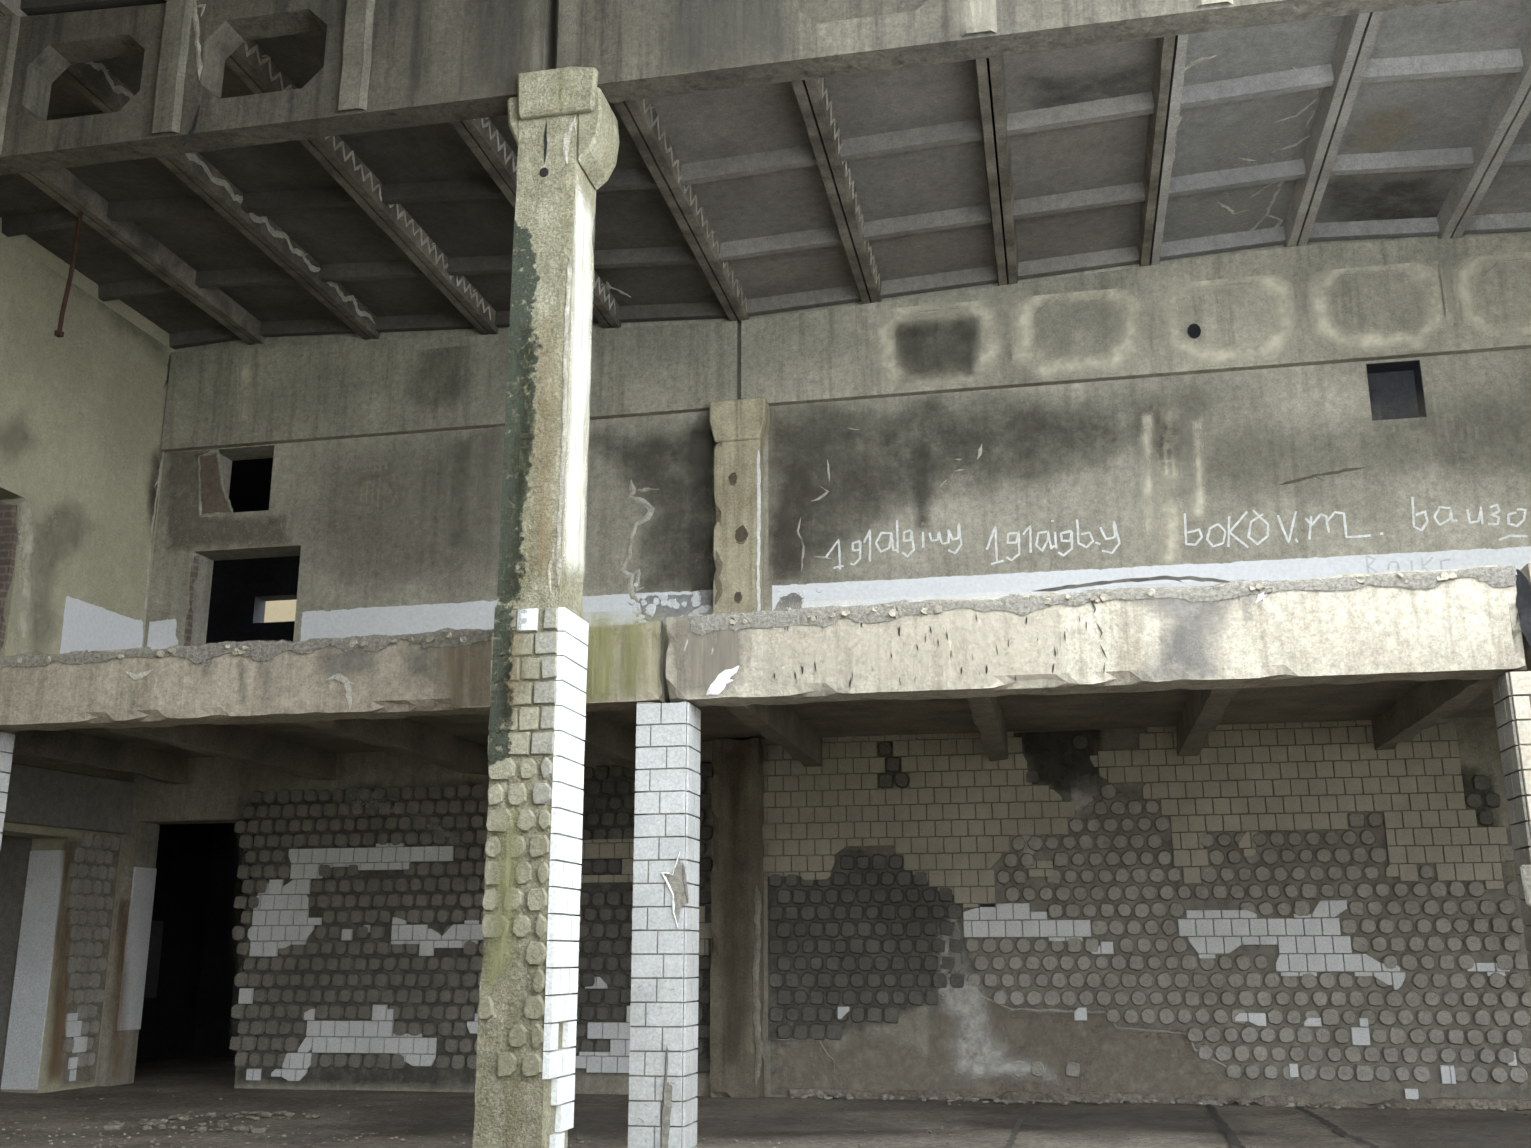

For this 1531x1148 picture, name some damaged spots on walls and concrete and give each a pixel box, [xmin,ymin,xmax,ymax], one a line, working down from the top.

leakage [473,117,517,173]
leakage [488,220,541,767]
leakage [547,193,631,592]
crack [619,480,667,694]
leakage [616,424,715,591]
leakage [768,288,1140,575]
leakage [1134,409,1204,564]
crack [1515,569,1531,647]
spalling [1520,865,1531,906]